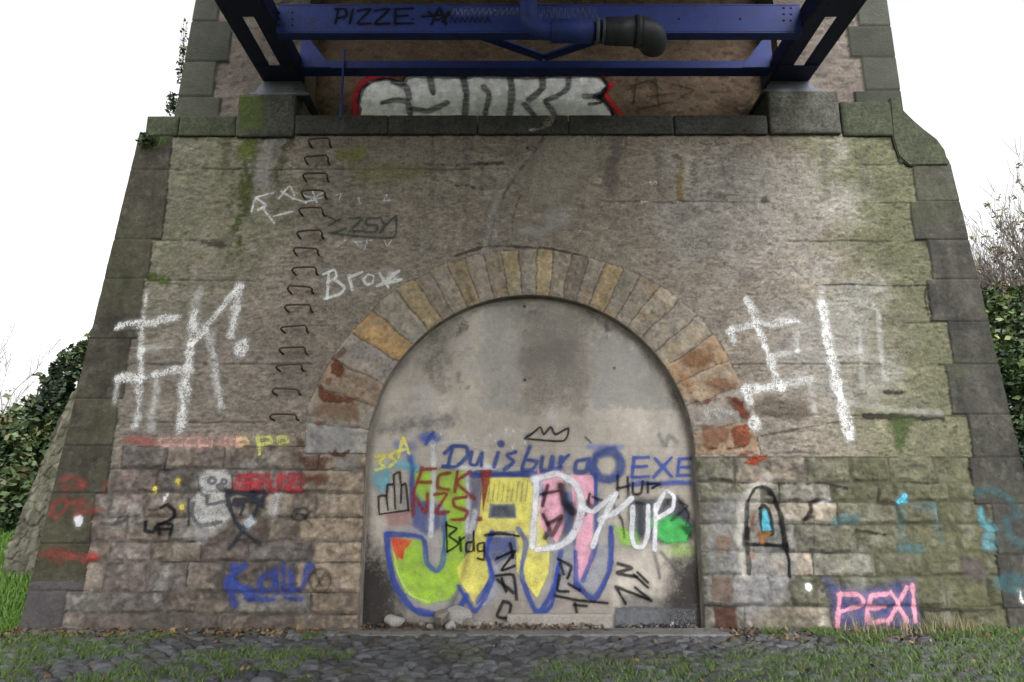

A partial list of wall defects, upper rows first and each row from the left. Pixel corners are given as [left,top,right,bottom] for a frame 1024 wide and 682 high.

crack [427,116,579,266]